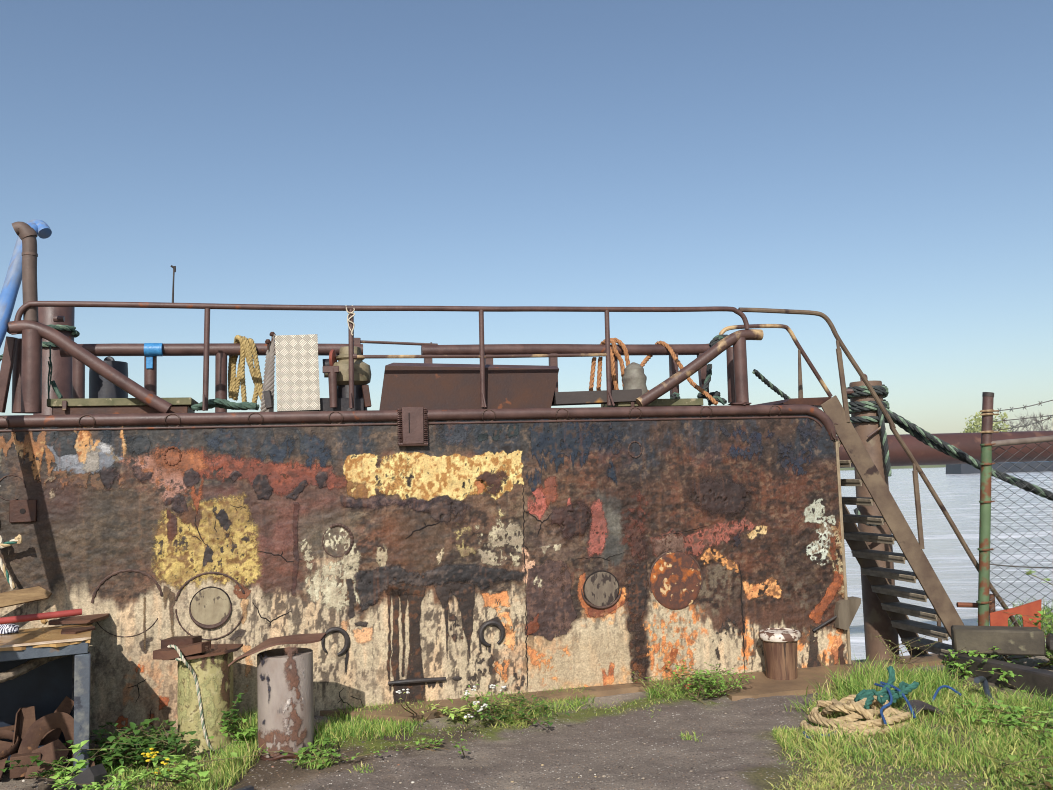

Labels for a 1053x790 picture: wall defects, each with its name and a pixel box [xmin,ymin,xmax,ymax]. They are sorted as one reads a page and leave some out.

peeling [44,440,571,613]
peeling [587,499,608,557]
peeling [804,499,836,566]
damp [346,571,370,619]
corrosion [701,548,782,600]
corrosion [809,522,844,624]
damp [385,582,527,704]
corrosion [643,618,695,680]
corrosion [831,628,845,665]